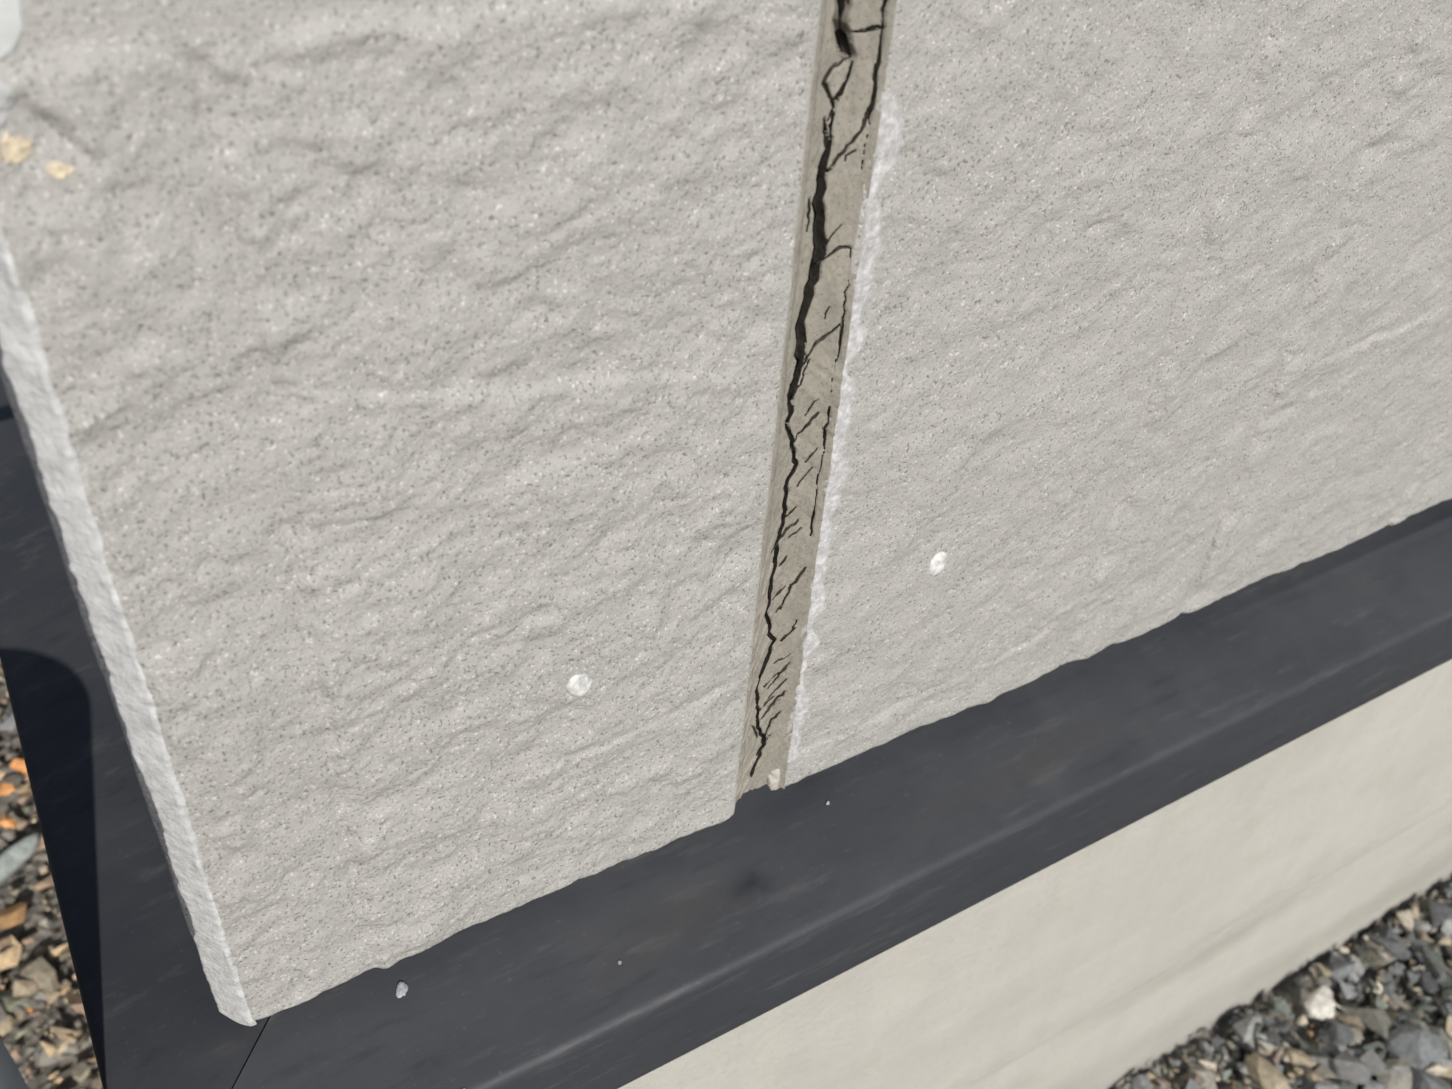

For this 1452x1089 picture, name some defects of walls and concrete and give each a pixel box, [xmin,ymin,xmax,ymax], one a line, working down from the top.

peeling [0,113,34,166]
peeling [22,107,94,179]
crack [750,0,887,778]